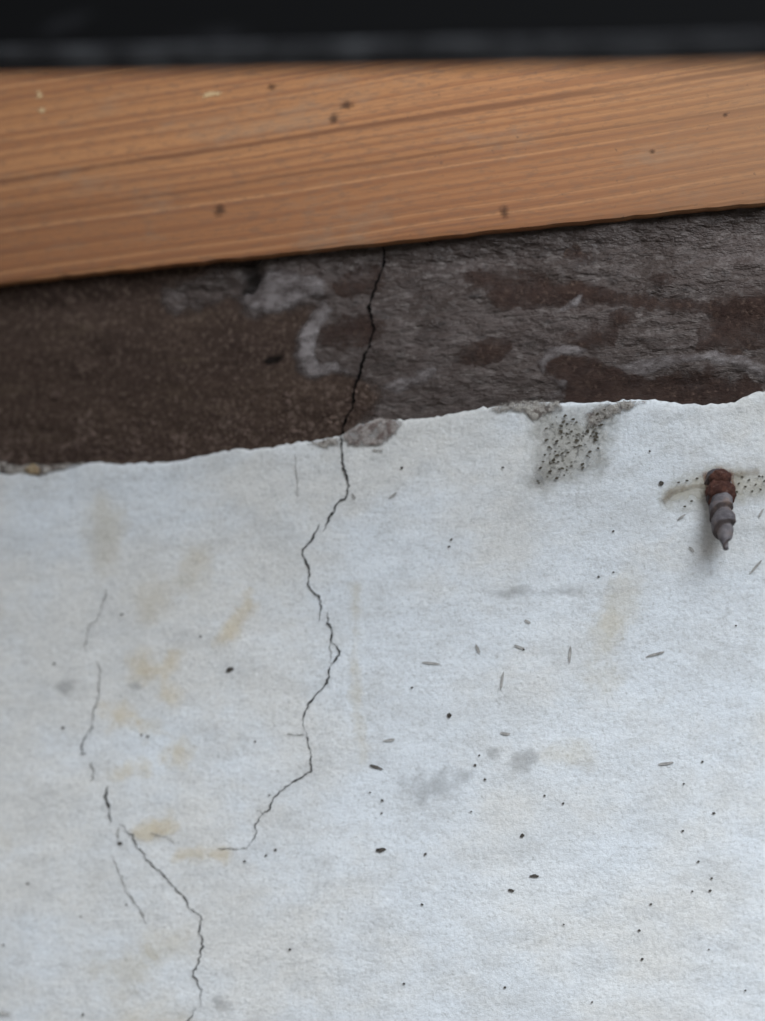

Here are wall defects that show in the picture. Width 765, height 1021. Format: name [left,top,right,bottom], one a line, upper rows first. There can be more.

spalling [0,462,85,477]
crack [218,246,386,850]
peeling [162,207,765,484]
crack [81,588,205,1021]